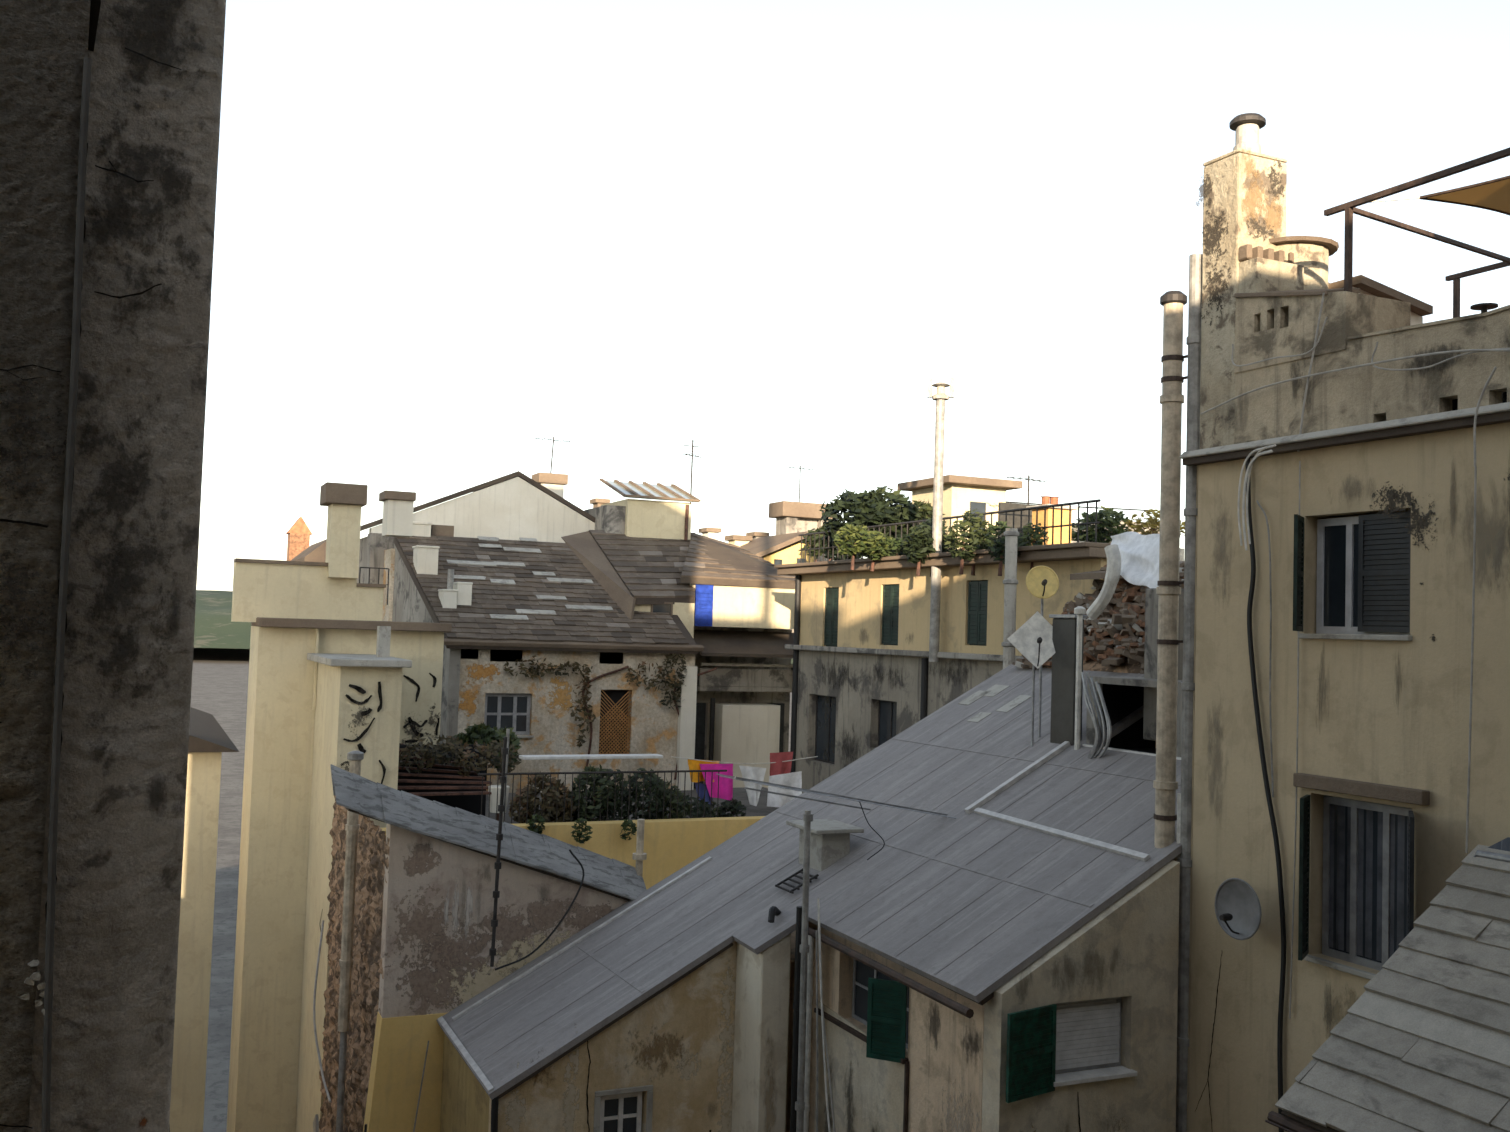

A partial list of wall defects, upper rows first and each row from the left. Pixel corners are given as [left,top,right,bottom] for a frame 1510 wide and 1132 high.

water stain [1242,150,1282,237]
crack [0,519,48,528]
water stain [822,663,903,688]
flaking render [385,844,613,1015]
water stain [930,1007,940,1041]